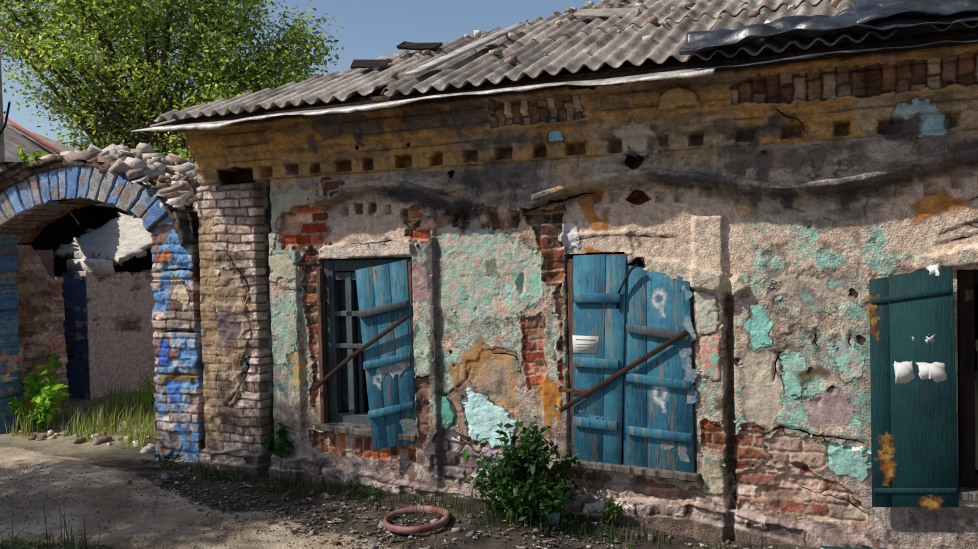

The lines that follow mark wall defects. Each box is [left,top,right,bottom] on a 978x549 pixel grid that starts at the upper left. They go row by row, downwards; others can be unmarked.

flaking render [730,52,978,138]
water stain [646,114,914,209]
crack [941,196,978,244]
peeling [158,339,169,366]
peeling [154,248,190,313]
flaking render [269,177,345,408]
peeling [309,202,580,487]
rust [866,296,880,340]
flaking render [566,262,871,529]
crack [760,426,864,451]
rust [878,433,895,485]
crack [796,483,868,515]